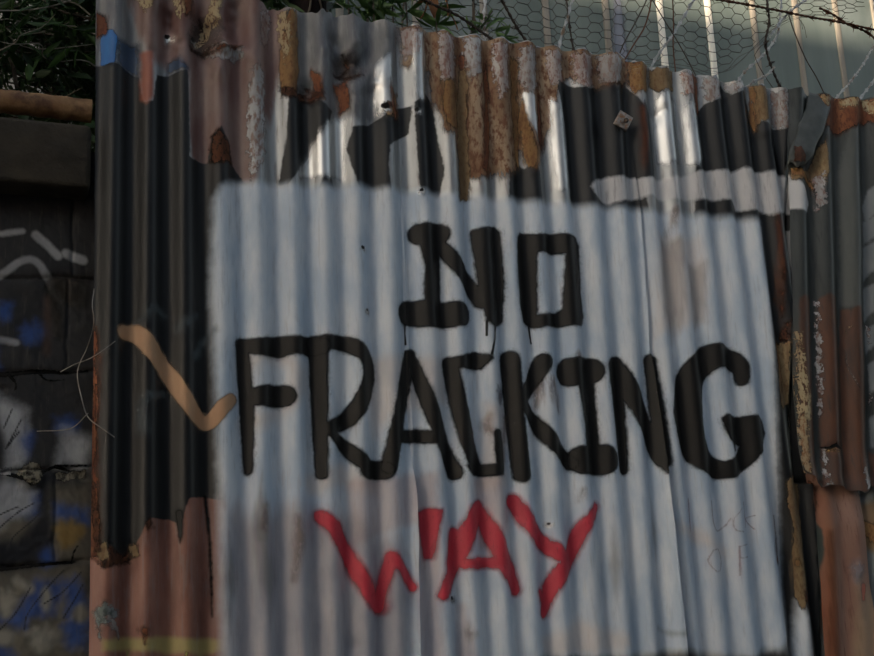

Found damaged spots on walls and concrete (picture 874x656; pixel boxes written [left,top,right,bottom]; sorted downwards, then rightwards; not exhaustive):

rust [96,13,108,39]
rust [208,128,232,165]
rust [397,25,647,202]
rust [786,94,874,213]
rust [91,330,102,559]
peeling [776,301,833,487]
peeling [785,474,808,609]